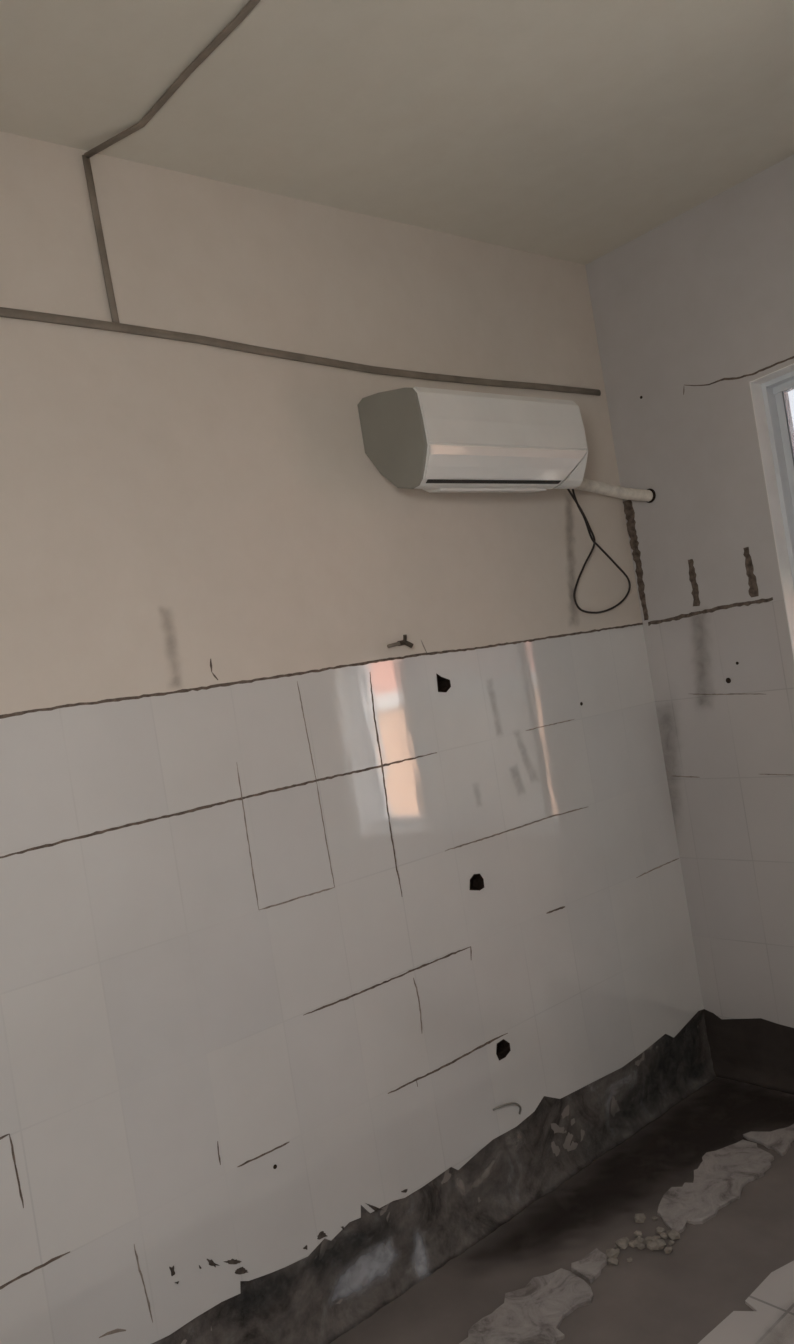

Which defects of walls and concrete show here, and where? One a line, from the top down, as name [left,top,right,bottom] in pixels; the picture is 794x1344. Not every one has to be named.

spalling [152,1009,794,1344]